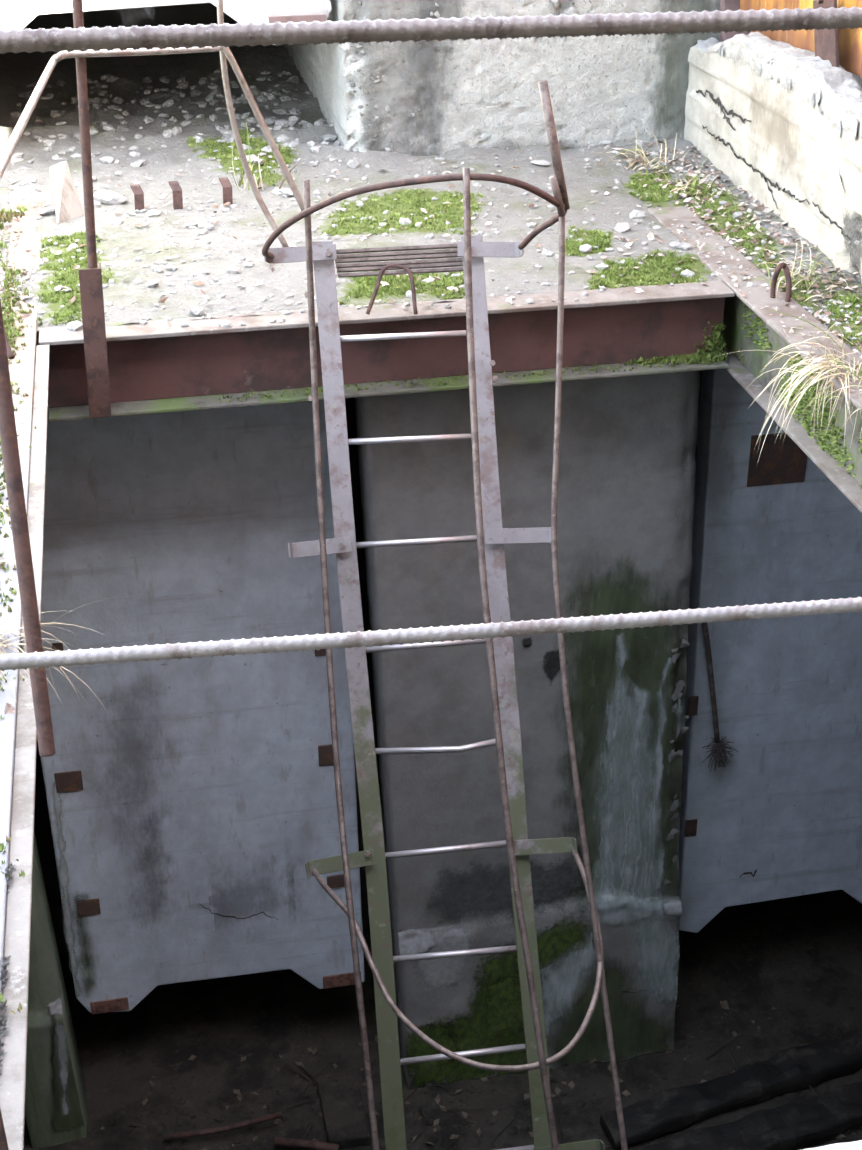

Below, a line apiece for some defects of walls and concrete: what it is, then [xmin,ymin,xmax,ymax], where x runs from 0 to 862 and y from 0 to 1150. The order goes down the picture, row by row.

spalling [350,0,458,21]
spalling [550,0,577,16]
spalling [349,40,440,154]
crack [696,90,851,241]
damp [530,633,682,913]
crack [198,903,279,920]
damp [417,865,514,988]
damp [635,919,678,1004]